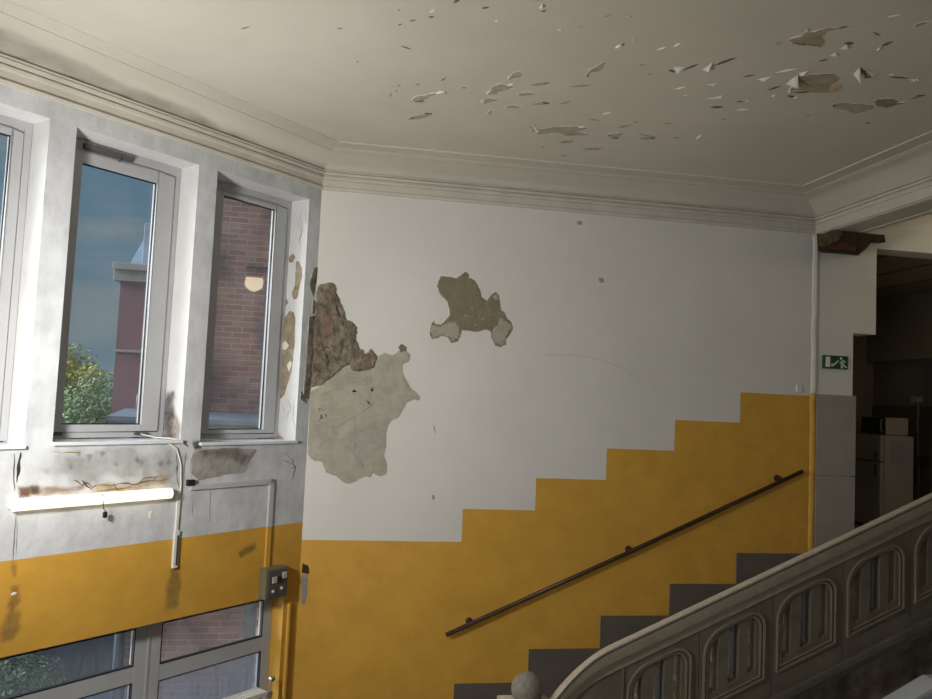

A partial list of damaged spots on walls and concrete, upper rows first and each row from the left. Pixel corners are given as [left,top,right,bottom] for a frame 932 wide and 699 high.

peeling [775,26,850,47]
peeling [668,57,737,74]
peeling [409,78,447,120]
peeling [480,71,571,115]
peeling [744,67,926,124]
peeling [531,112,611,143]
peeling [429,271,513,348]
peeling [280,208,420,485]